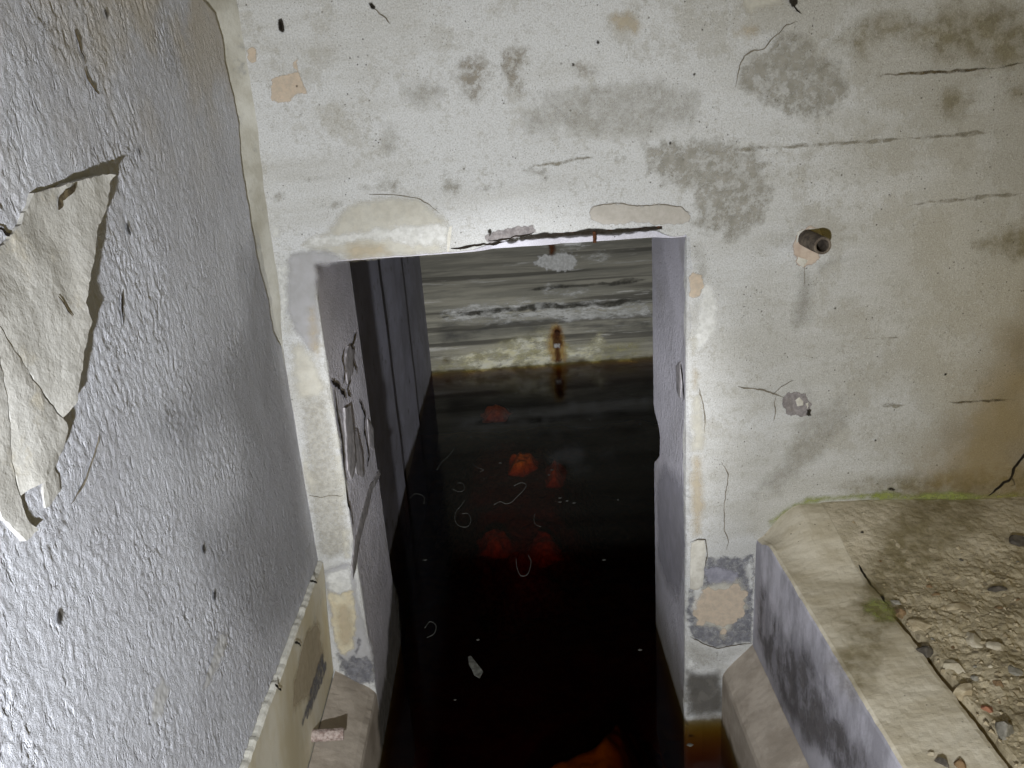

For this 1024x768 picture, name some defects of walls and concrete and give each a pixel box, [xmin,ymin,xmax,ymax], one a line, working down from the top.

crack [885,63,1019,75]
crack [788,131,983,148]
crack [953,193,1009,201]
spalling [793,226,822,267]
spalling [689,273,718,350]
rust [550,327,564,362]
peeling [354,419,374,478]
crack [989,454,1024,496]
peeling [687,539,755,649]